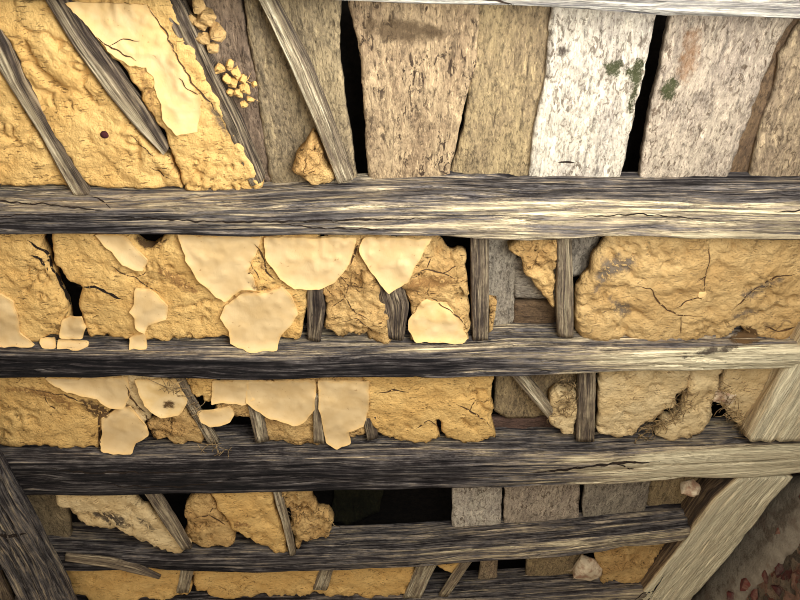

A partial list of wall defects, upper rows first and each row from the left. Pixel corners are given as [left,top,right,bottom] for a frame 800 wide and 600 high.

peeling [65,1,202,136]
peeling [0,293,89,351]
peeling [95,234,167,271]
peeling [129,288,168,350]
crack [0,196,446,331]
peeling [158,235,452,353]
peeling [408,299,468,344]
crack [636,251,710,331]
crack [737,274,794,306]
peeling [7,376,188,455]
peeling [197,379,370,450]